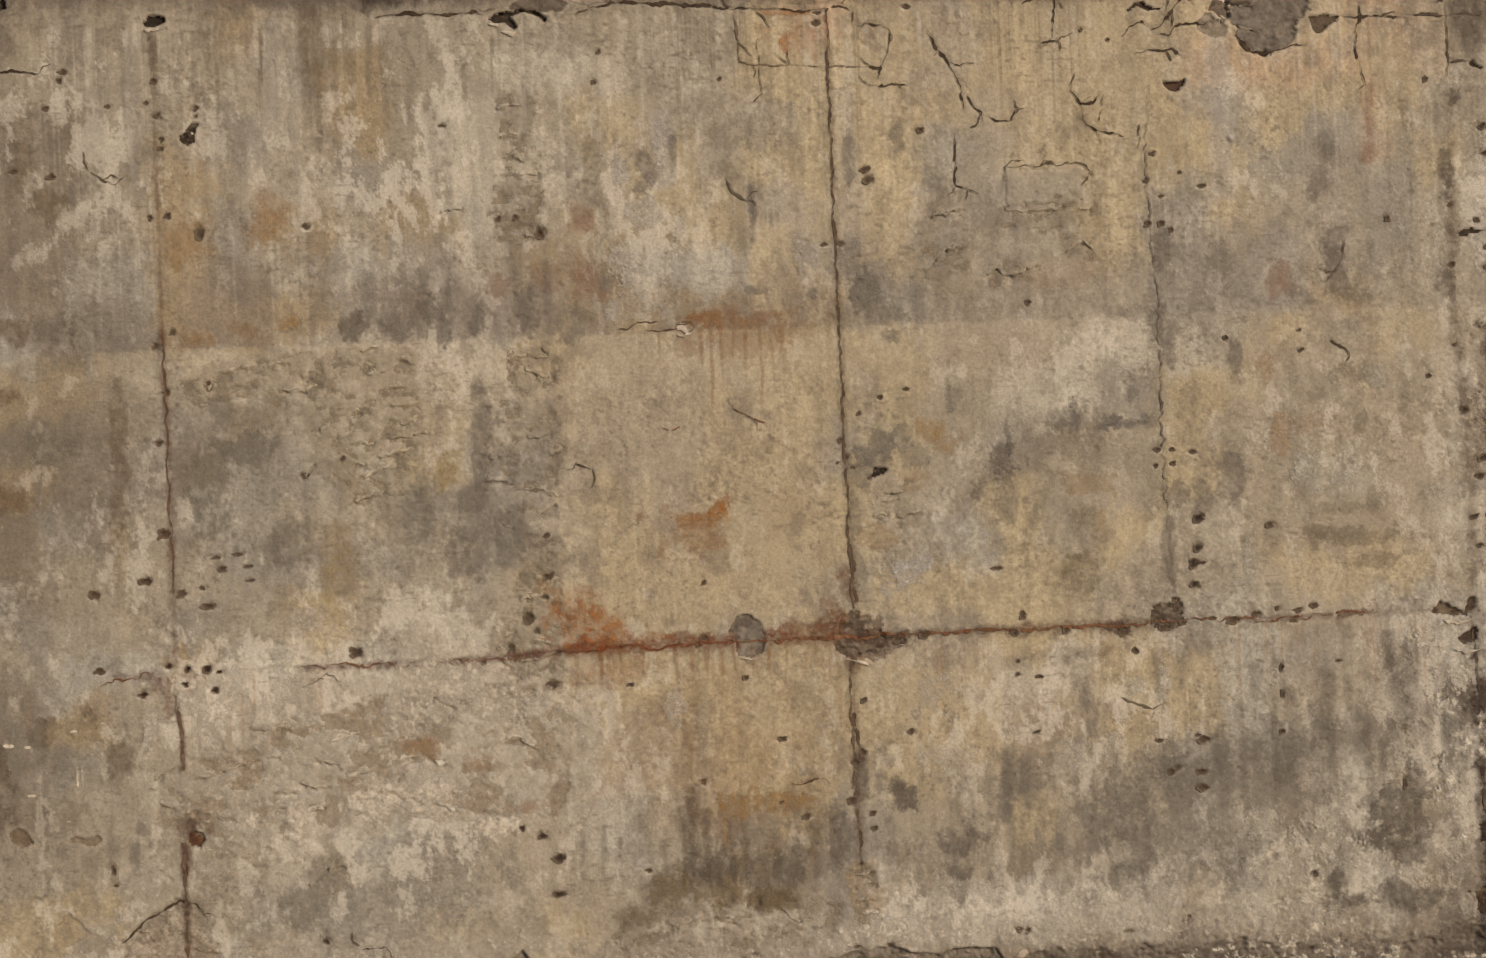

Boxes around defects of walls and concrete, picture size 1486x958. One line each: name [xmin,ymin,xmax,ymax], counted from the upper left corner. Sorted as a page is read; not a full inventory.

crack [577,0,908,102]
crack [1122,0,1301,61]
spalling [1197,0,1339,57]
crack [929,0,1141,199]
crack [726,178,757,206]
peeling [1460,394,1486,489]
corrosion [534,600,733,668]
spalling [52,914,90,949]
spalling [125,902,221,958]
spalling [714,862,1486,958]